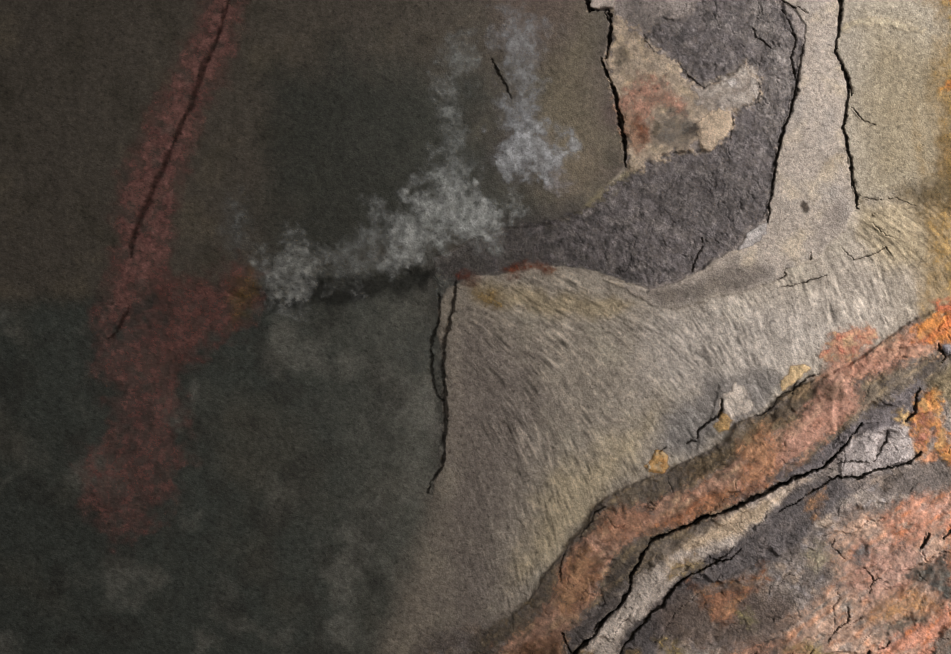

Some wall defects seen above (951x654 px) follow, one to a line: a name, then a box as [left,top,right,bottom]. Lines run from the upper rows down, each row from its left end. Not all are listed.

crack [130,6,228,257]
water stain [344,168,502,277]
crack [491,59,512,99]
water stain [496,93,579,187]
spalling [506,0,804,286]
crack [780,254,827,287]
crack [834,0,916,260]
crack [431,287,457,478]
rust [473,302,951,654]
crack [559,388,921,654]
crack [754,375,814,416]